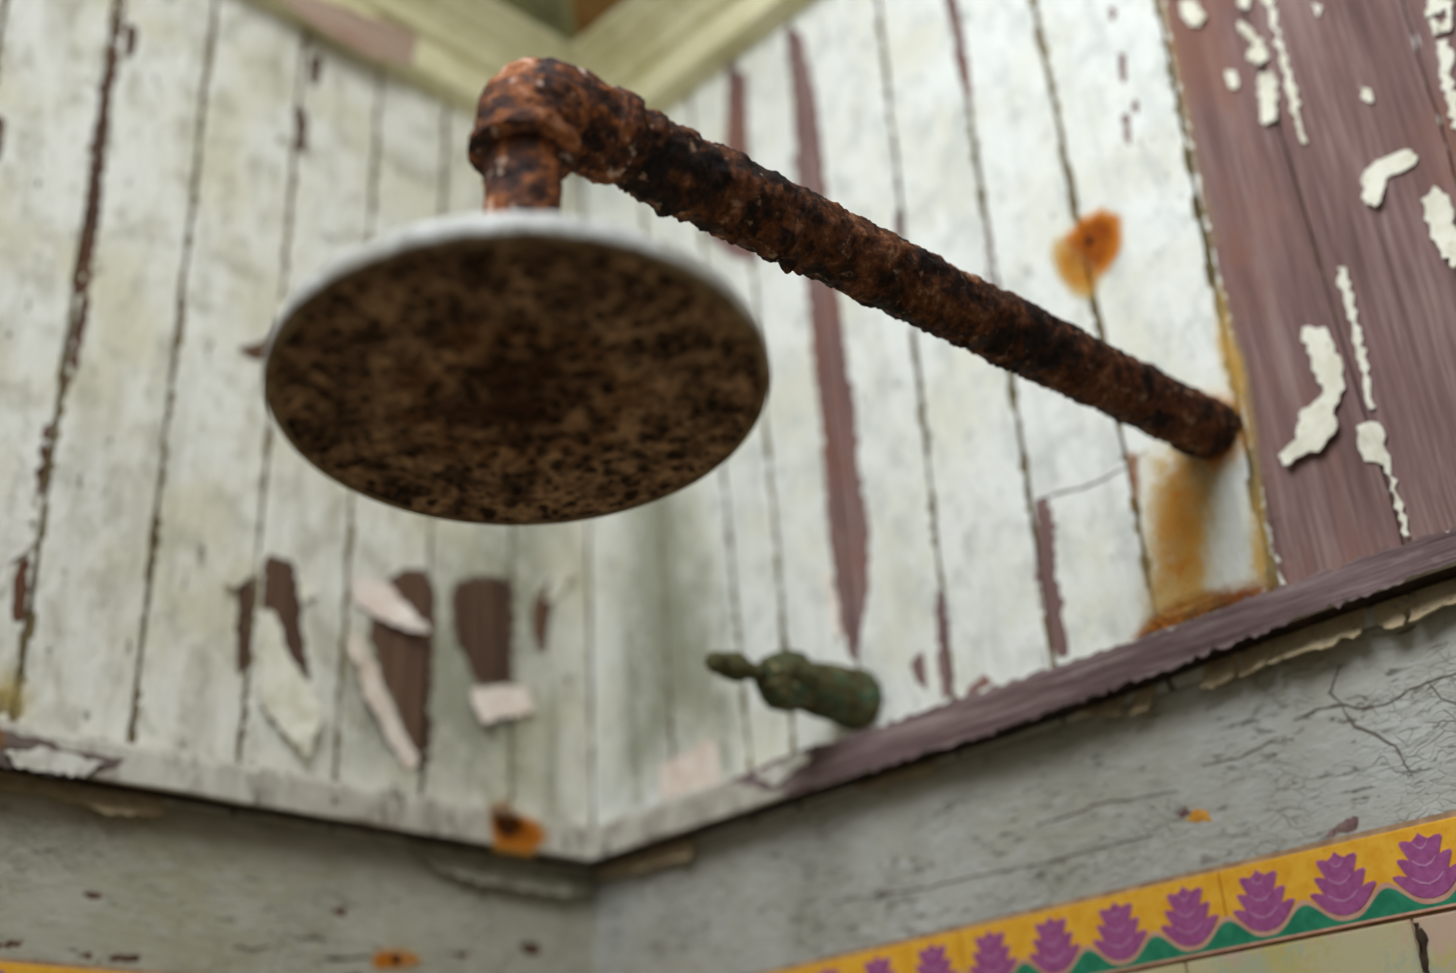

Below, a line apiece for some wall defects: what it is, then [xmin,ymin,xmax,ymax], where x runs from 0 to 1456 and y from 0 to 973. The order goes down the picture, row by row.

rust [1052,209,1121,297]
peeling [658,0,1456,800]
rust [1217,293,1245,413]
rust [1129,431,1269,640]
peeling [0,679,166,816]
peeling [223,553,322,757]
peeling [346,564,575,776]
rust [489,801,547,853]
crack [829,836,1152,904]
crack [1036,790,1177,823]
crack [1202,664,1456,777]
crack [1413,923,1429,973]